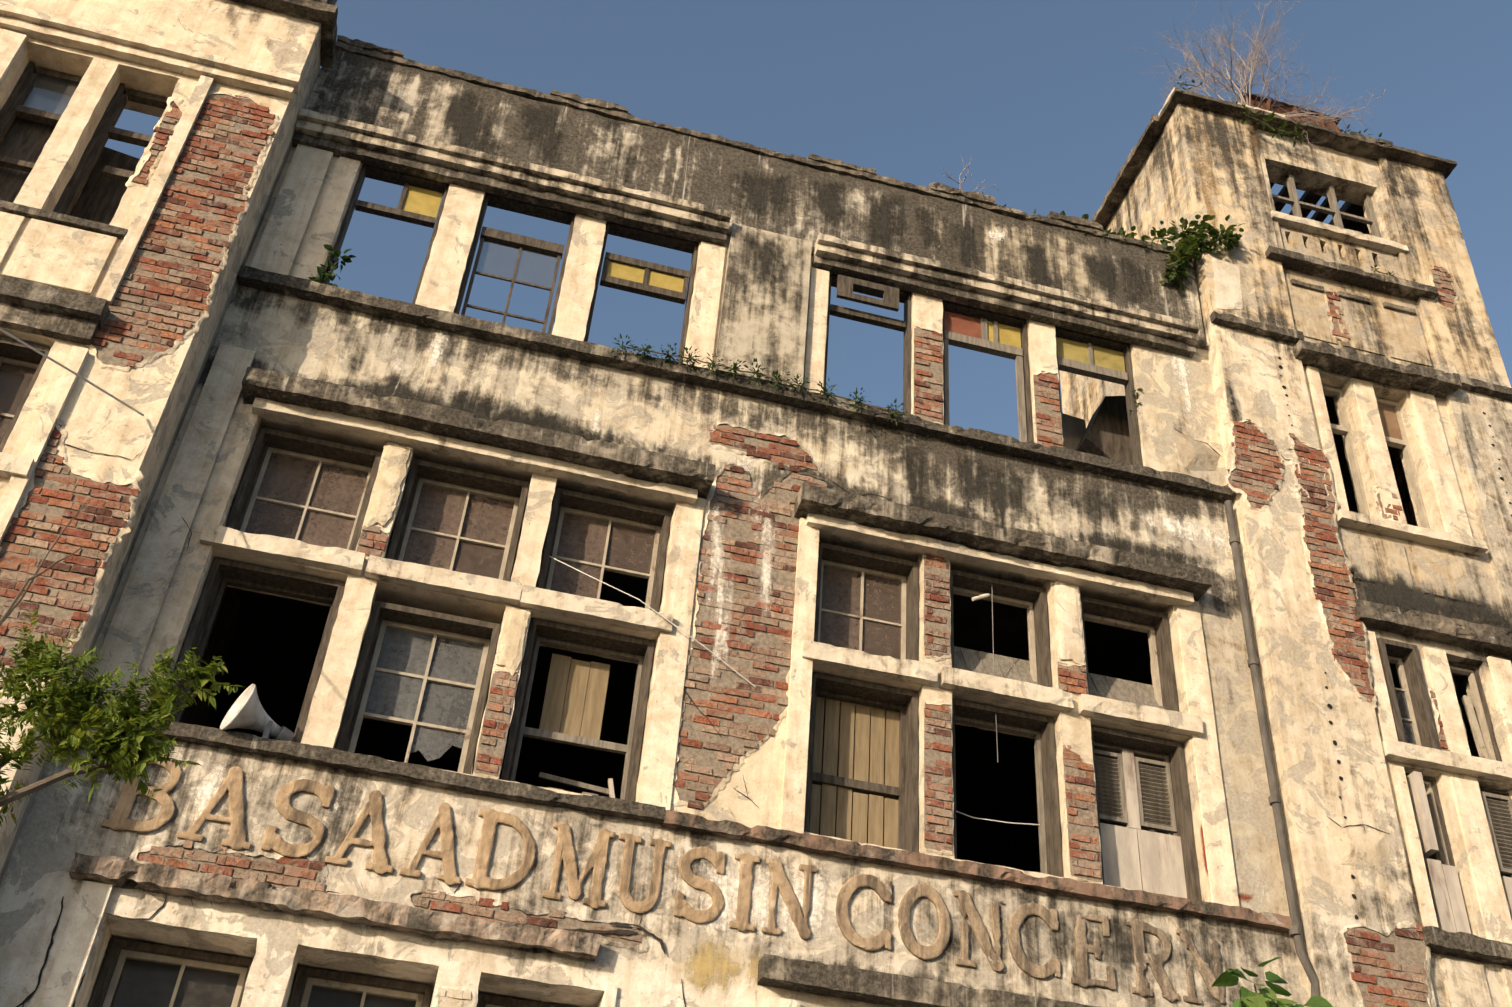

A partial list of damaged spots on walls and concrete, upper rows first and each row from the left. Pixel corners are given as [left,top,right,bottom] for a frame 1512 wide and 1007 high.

water stain [444,93,496,155]
spalling [86,91,280,372]
water stain [869,194,1057,288]
water stain [339,319,666,453]
spalling [0,423,144,676]
spalling [671,421,833,810]
water stain [897,449,1039,530]
water stain [1063,490,1232,564]
spalling [1224,419,1377,708]
crack [16,896,64,1007]
crack [106,894,213,920]
spalling [1338,922,1432,1007]